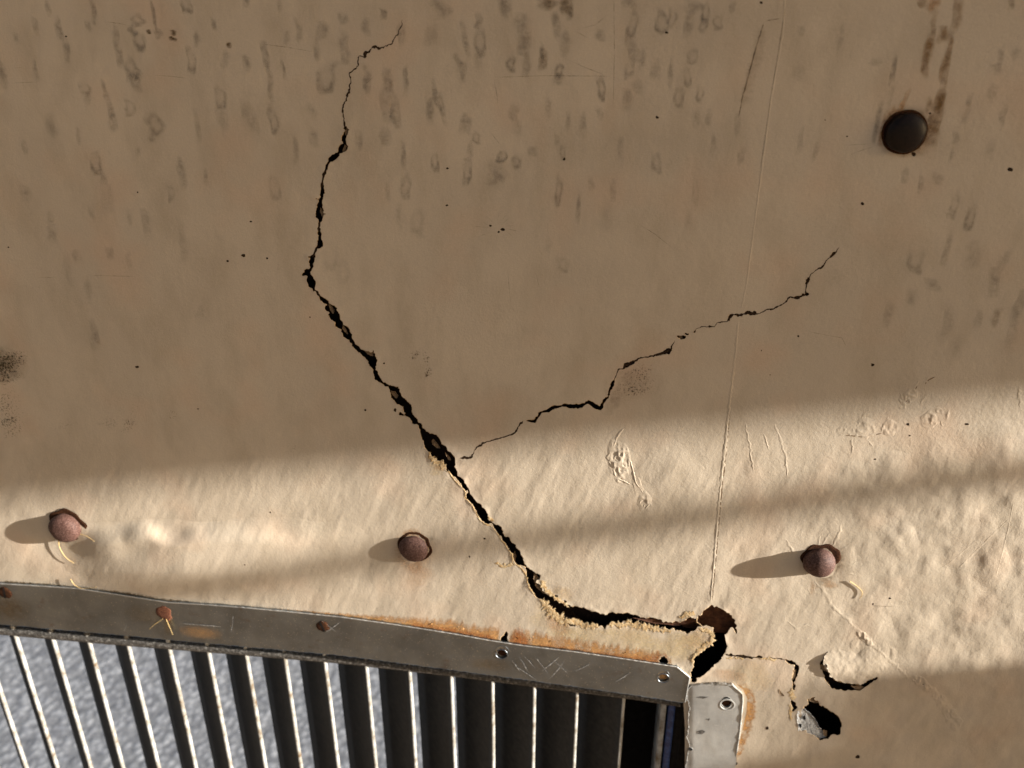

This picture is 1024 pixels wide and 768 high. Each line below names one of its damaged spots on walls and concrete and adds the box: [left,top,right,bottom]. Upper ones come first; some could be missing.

crack [302,21,839,634]
rust [312,611,671,663]
peeling [823,639,901,685]